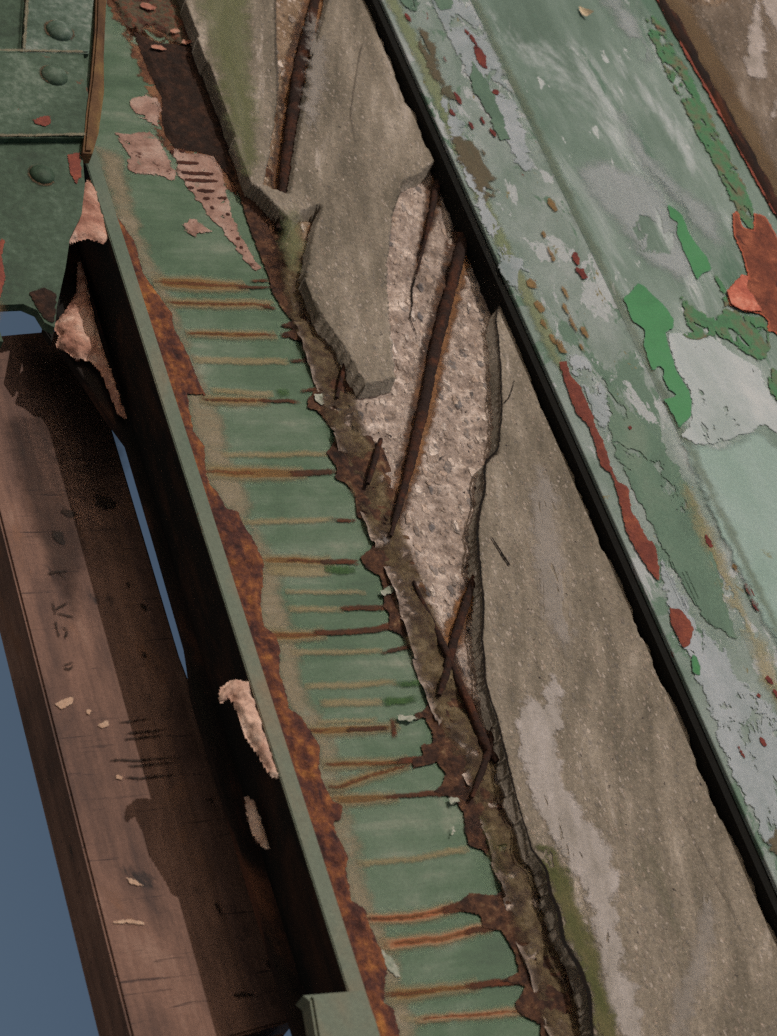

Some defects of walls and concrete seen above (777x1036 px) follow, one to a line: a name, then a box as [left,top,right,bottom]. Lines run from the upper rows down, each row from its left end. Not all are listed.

peeling [98,95,261,345]
spalling [263,0,322,193]
rust [107,0,582,1036]
spalling [293,172,500,805]
peeling [431,0,534,171]
peeling [458,156,530,298]
rust [526,278,660,580]
peeling [624,204,777,445]
peeling [252,531,343,796]
crack [476,302,594,1036]
peeling [661,559,777,855]
peeling [333,814,413,1036]